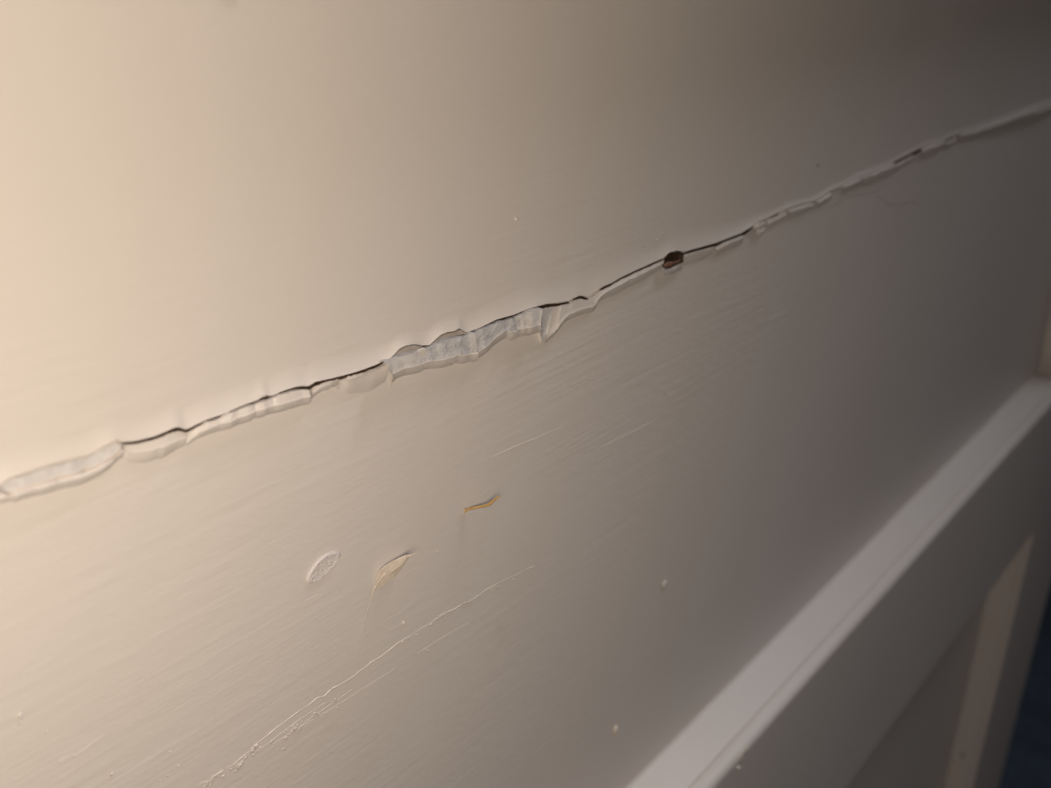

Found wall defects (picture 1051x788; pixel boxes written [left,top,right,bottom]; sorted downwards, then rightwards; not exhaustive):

crack [0,96,1051,504]